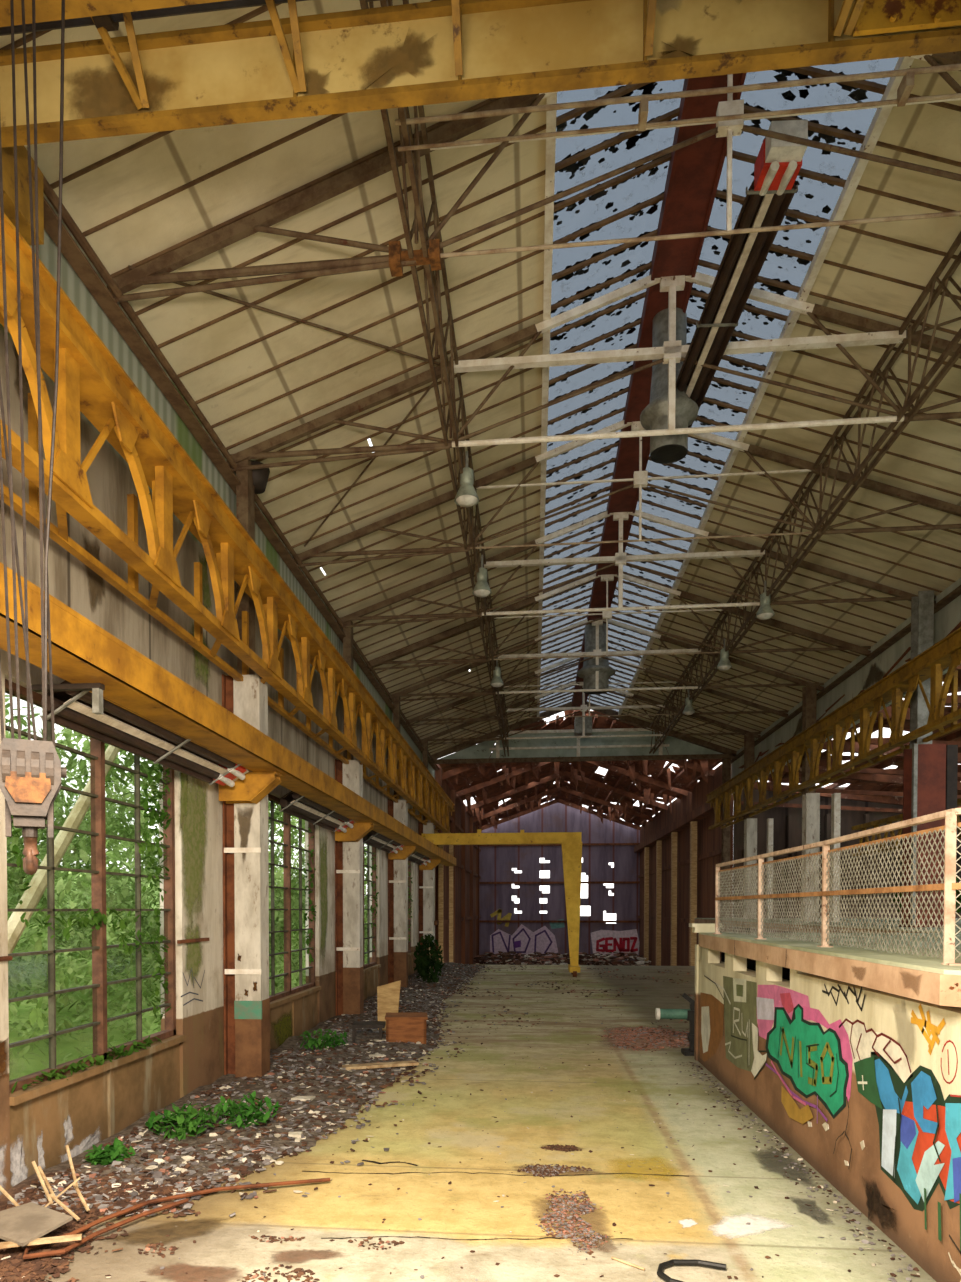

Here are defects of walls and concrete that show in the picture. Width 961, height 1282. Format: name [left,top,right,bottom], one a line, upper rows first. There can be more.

water stain [180,773,188,828]
water stain [185,926,201,982]